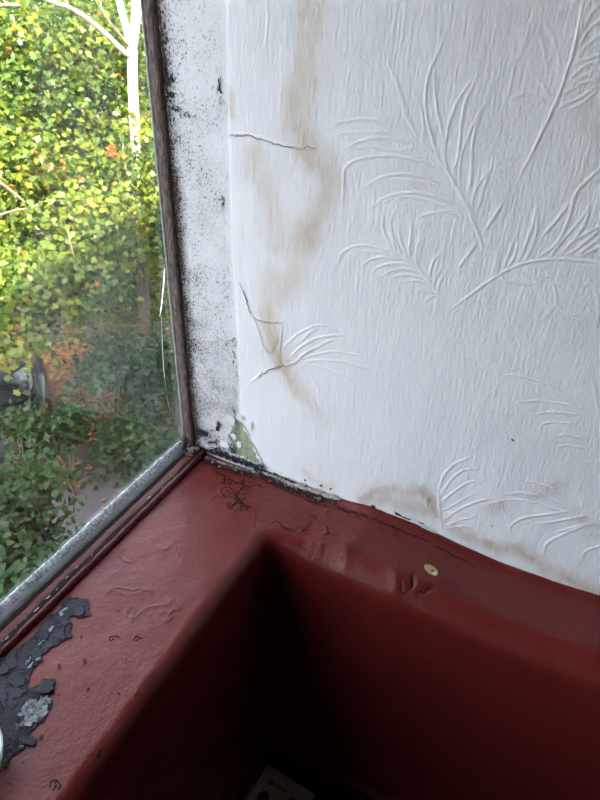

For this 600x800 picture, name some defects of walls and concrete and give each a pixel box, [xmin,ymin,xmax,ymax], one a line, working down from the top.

crack [232,134,315,150]
damp [156,0,241,464]
crack [239,283,282,357]
crack [212,471,475,567]
peeling [0,416,341,769]